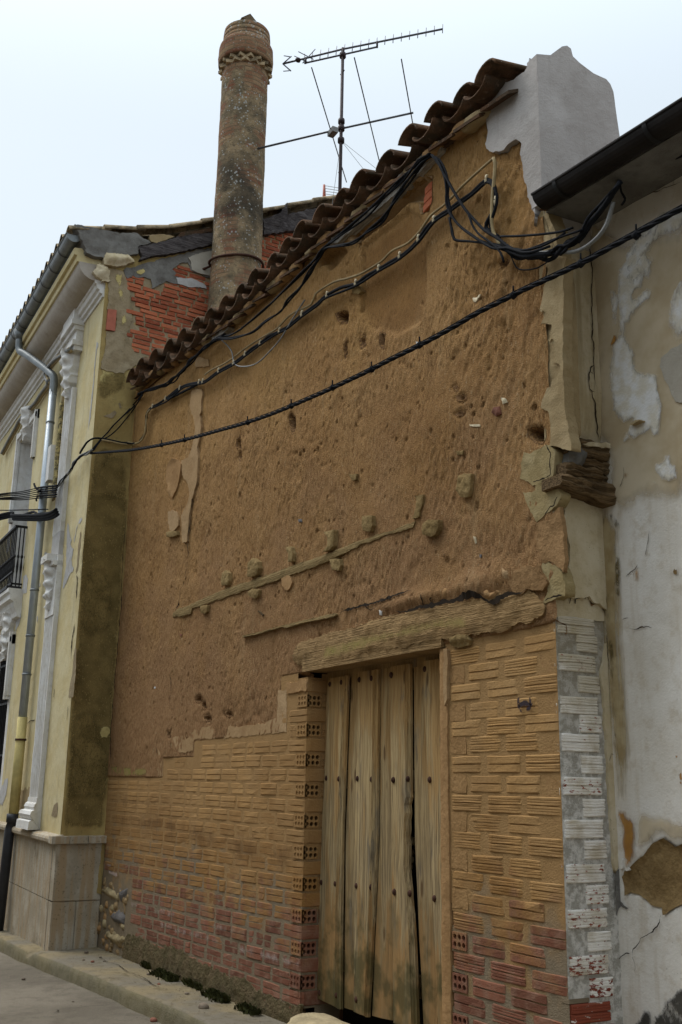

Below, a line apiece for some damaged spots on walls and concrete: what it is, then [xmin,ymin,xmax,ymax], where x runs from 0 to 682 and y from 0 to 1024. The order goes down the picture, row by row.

peeling [166,388,204,543]
peeling [520,256,607,611]
crack [588,249,599,437]
peeling [610,212,682,441]
peeling [655,456,676,481]
damp [66,449,146,826]
crack [342,589,652,661]
flaking render [614,838,682,915]